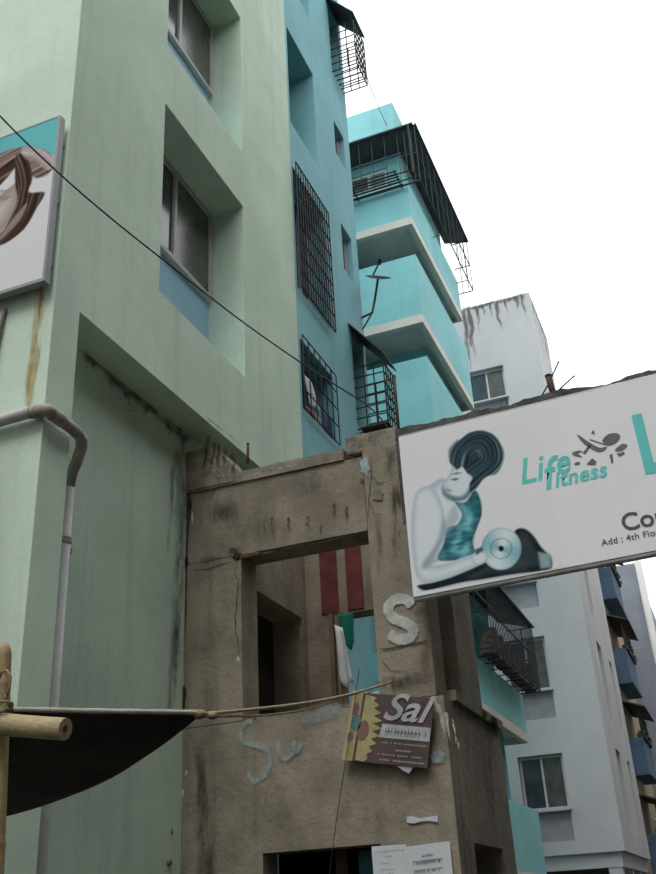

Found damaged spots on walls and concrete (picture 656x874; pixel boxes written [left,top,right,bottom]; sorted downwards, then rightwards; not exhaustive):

corrosion [26,287,43,406]
damp [461,294,550,358]
damp [85,354,156,411]